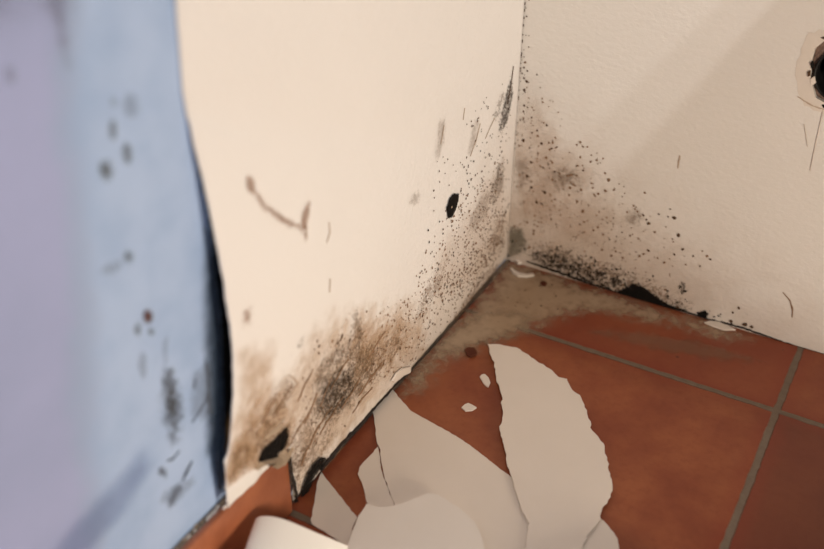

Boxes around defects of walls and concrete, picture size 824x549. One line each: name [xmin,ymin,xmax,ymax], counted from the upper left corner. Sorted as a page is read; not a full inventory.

water stain [254,2,823,503]
peeling [264,423,284,439]
peeling [253,448,294,470]